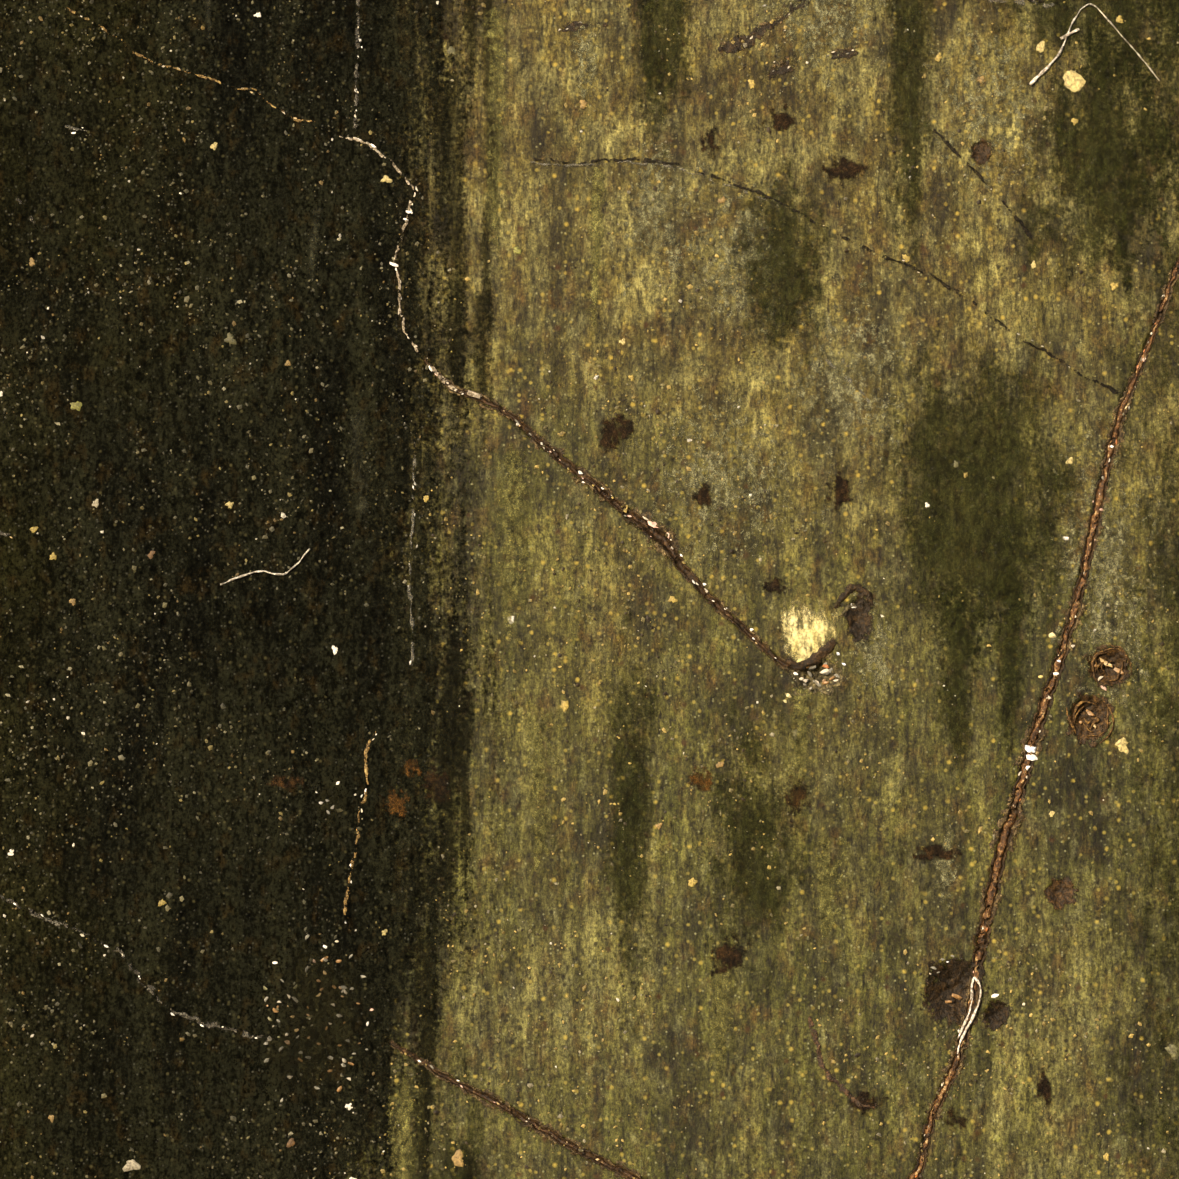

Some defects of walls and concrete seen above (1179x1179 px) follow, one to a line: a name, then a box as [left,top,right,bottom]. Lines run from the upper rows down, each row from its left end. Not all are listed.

water stain [586,116,802,360]
water stain [762,104,795,131]
water stain [822,156,867,184]
crack [933,129,1032,238]
water stain [1101,0,1179,328]
water stain [632,263,926,581]
crack [531,157,1179,1179]
water stain [938,586,983,764]
water stain [995,567,1025,750]
water stain [1043,399,1179,989]
crack [389,1039,642,1179]
water stain [1037,1068,1051,1107]